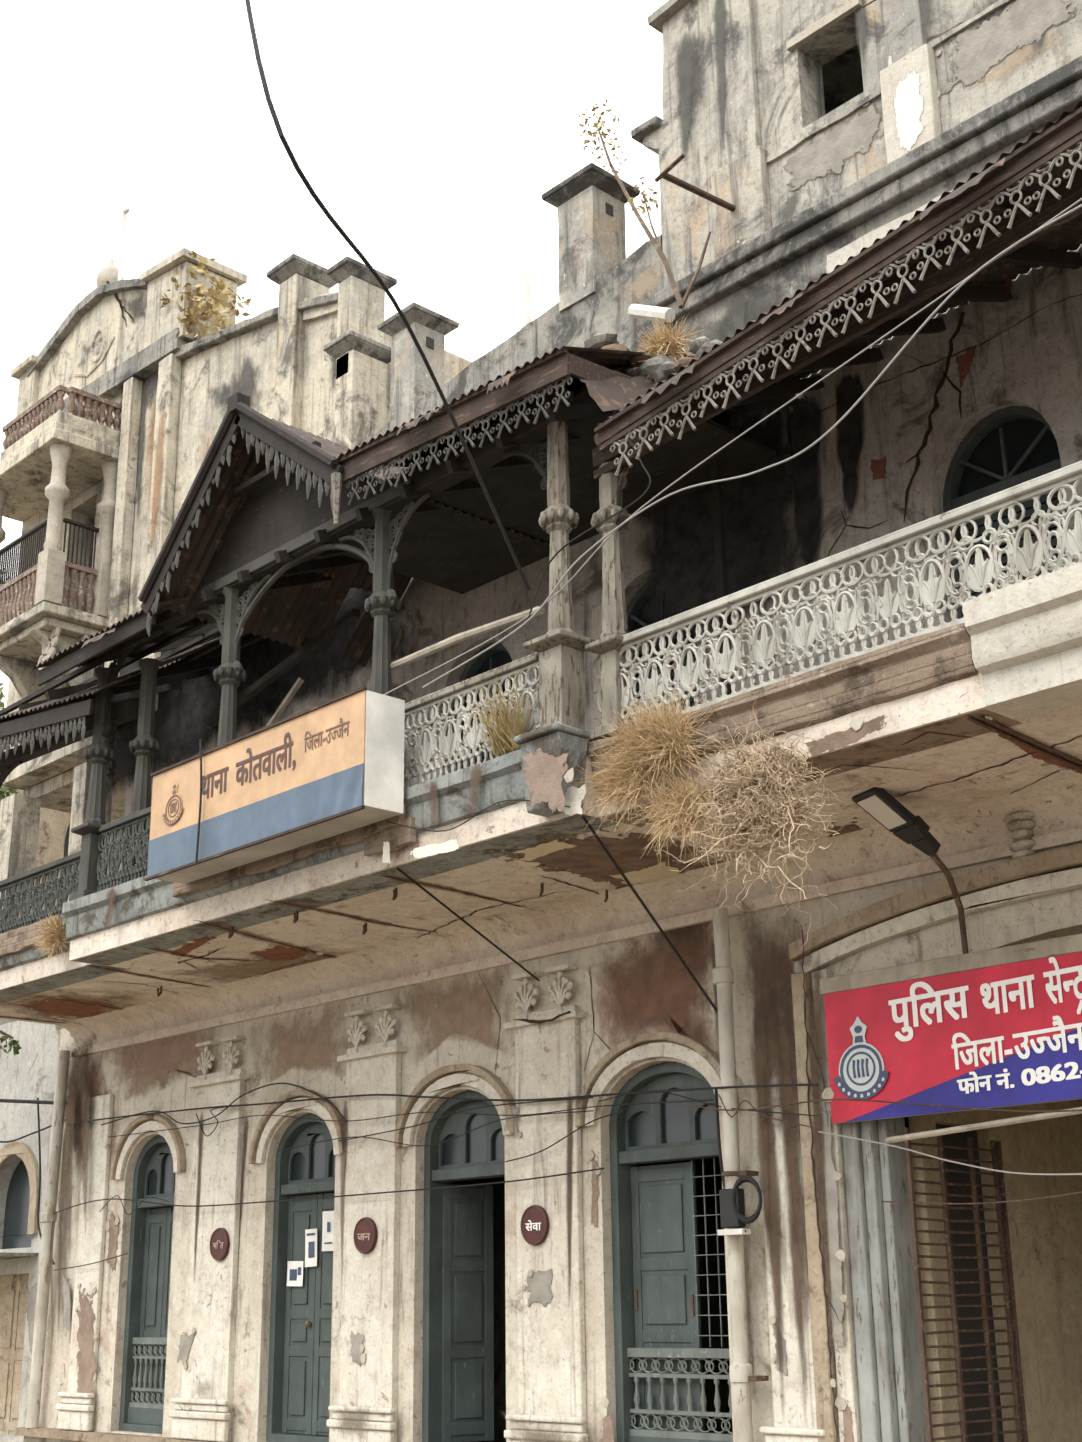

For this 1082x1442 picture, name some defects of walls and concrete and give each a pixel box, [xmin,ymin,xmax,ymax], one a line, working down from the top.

leakage [677,0,726,155]
leakage [786,374,863,566]
crack [820,294,1082,556]
peeling [522,748,574,813]
leakage [687,852,738,870]
leakage [604,910,719,1048]
leakage [741,920,831,1392]
peeling [75,1284,98,1405]
peeling [177,1328,196,1370]
peeling [350,1331,366,1365]
peeling [522,1268,553,1307]